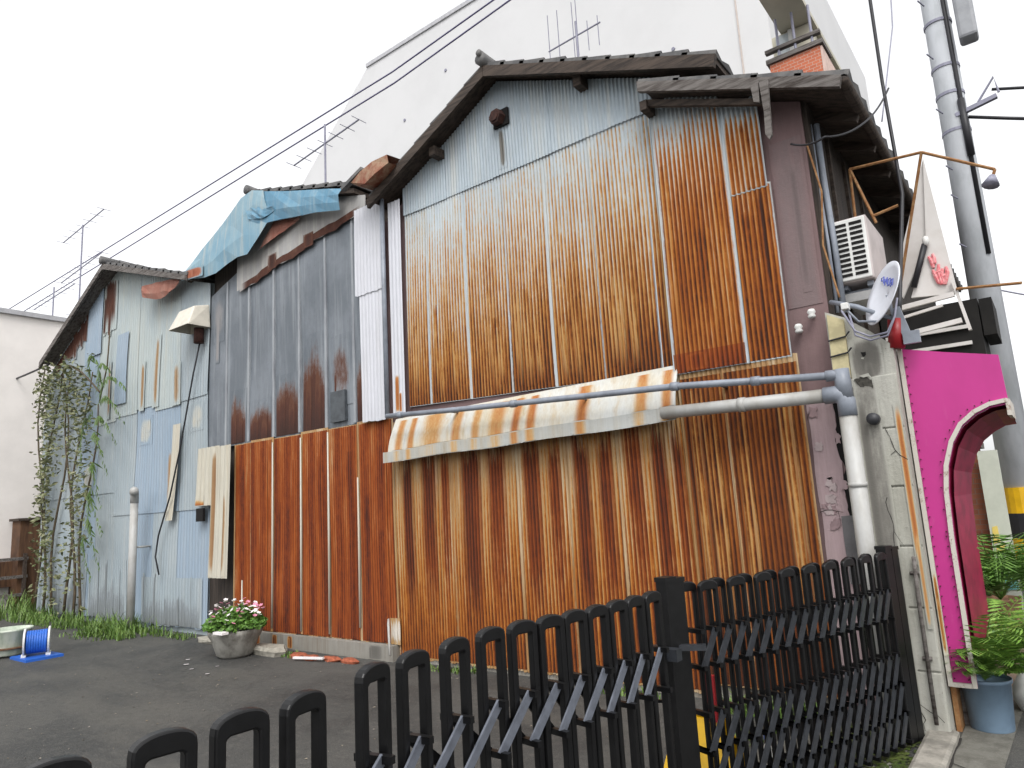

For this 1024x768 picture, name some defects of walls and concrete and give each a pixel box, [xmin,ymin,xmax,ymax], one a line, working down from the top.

rust [52,313,89,374]
rust [103,280,118,337]
rust [139,334,181,412]
rust [195,96,835,691]
peeling [806,403,872,676]
rust [892,403,949,656]